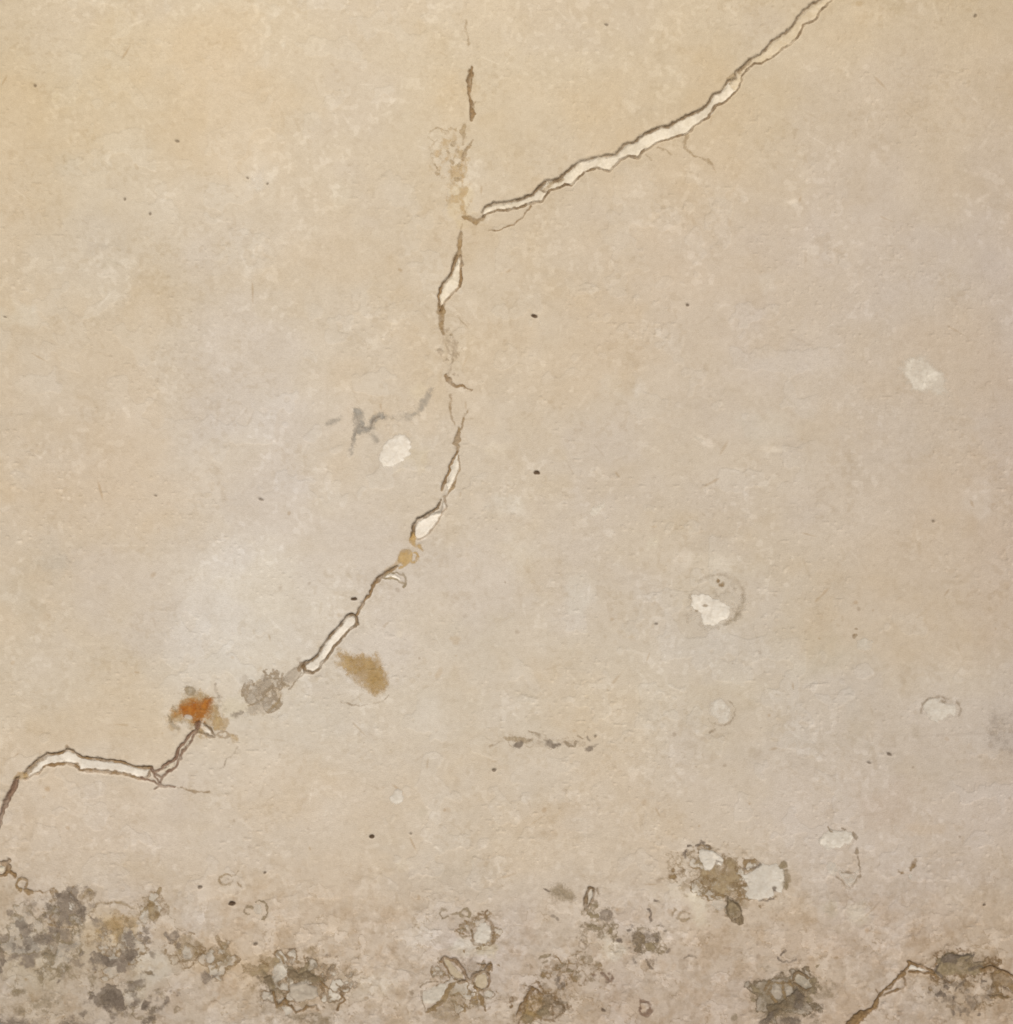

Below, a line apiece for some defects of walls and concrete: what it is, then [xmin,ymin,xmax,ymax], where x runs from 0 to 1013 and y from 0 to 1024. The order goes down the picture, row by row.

crack [437,0,832,334]
spalling [379,434,411,467]
crack [301,374,471,674]
spalling [691,579,730,626]
rust [171,687,224,730]
crack [1,721,213,813]
peeling [683,840,789,925]
leakage [0,887,162,1024]
peeling [242,949,355,1016]
peeling [421,908,500,1013]
peeling [510,981,568,1023]
peeling [745,951,822,1024]